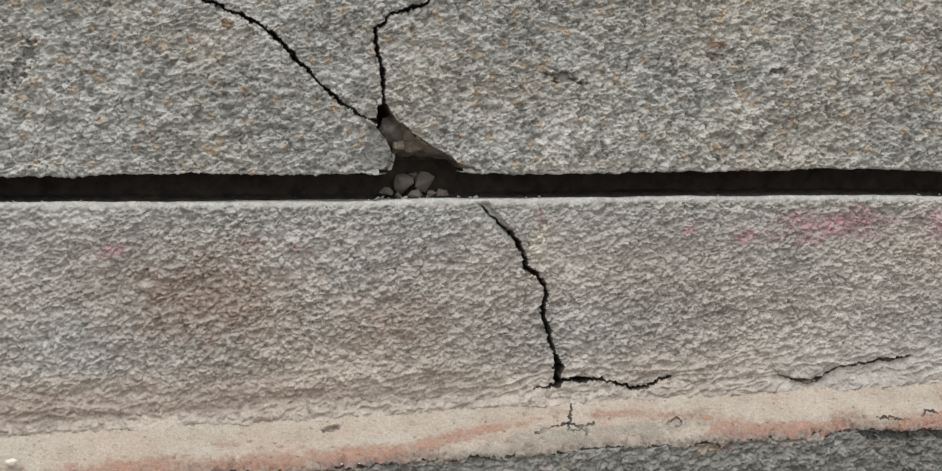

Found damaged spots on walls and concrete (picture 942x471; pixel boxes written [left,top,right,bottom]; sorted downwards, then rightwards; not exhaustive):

crack [201,0,431,124]
spalling [359,103,478,175]
crack [473,201,672,436]
crack [777,355,913,384]